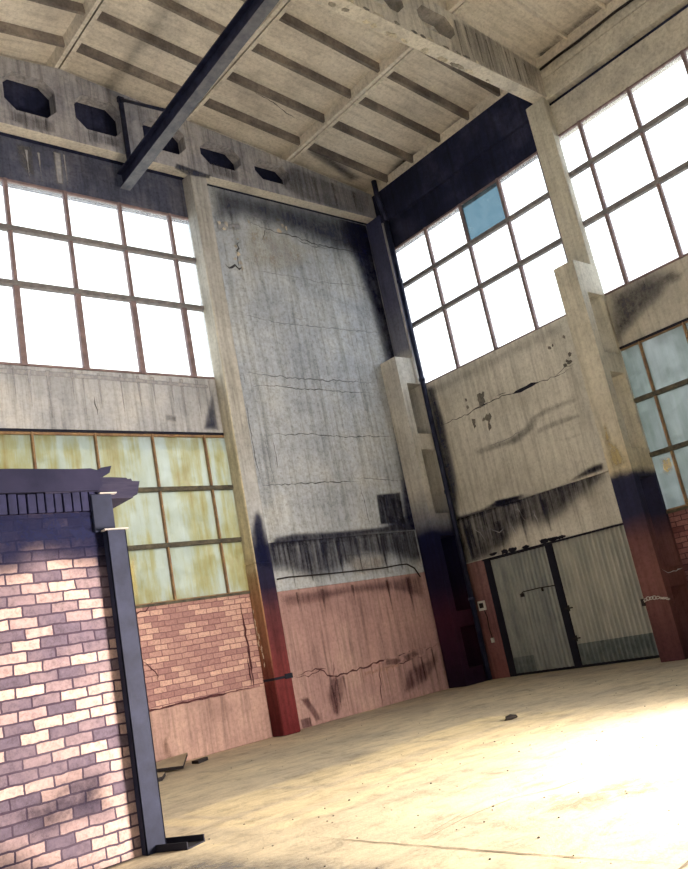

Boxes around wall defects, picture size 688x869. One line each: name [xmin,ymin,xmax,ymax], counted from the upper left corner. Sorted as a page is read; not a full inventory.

crack [243,372,371,393]
spalling [465,391,492,431]
crack [443,366,568,425]
crack [247,409,398,522]
crack [149,610,254,712]
crack [294,647,432,714]